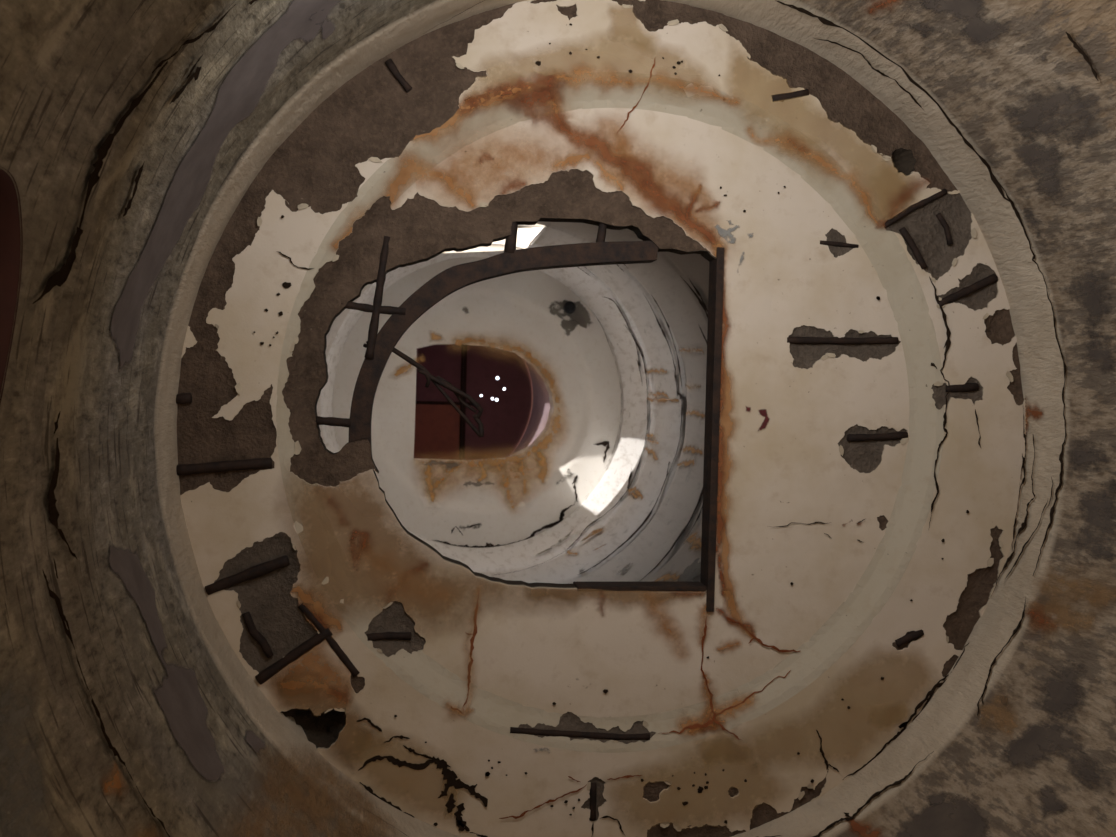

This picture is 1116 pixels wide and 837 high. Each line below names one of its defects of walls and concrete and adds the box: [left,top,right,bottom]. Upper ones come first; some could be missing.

spalling [177,4,711,495]
rust [385,67,739,257]
spalling [612,0,1024,405]
crack [769,0,1067,716]
crack [433,266,683,712]
rust [530,284,755,651]
spalling [941,526,1004,677]
rust [277,647,372,760]
crack [345,717,642,837]
leakage [896,792,991,837]
leakage [1039,785,1067,817]
leakage [1004,664,1111,792]